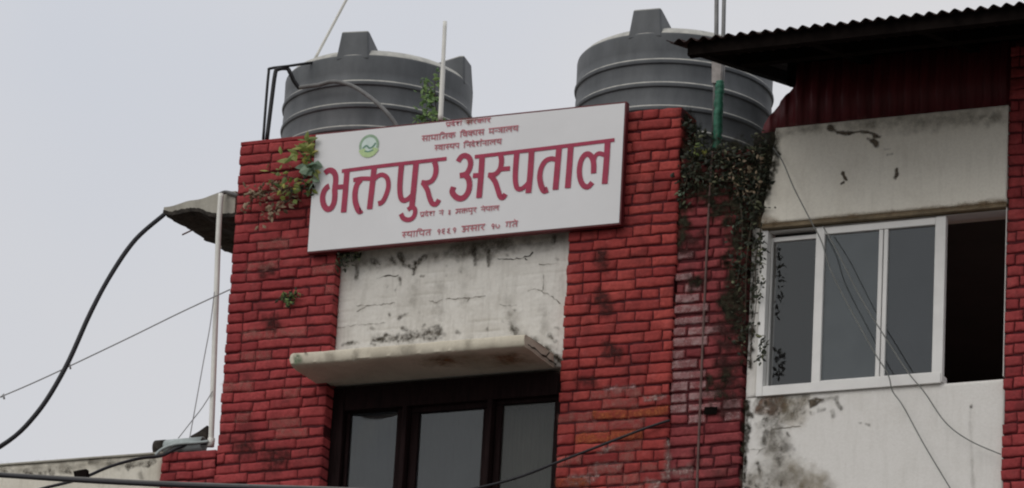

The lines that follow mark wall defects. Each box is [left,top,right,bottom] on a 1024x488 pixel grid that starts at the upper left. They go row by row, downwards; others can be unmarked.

crack [430,252,560,306]
damp [372,316,441,342]